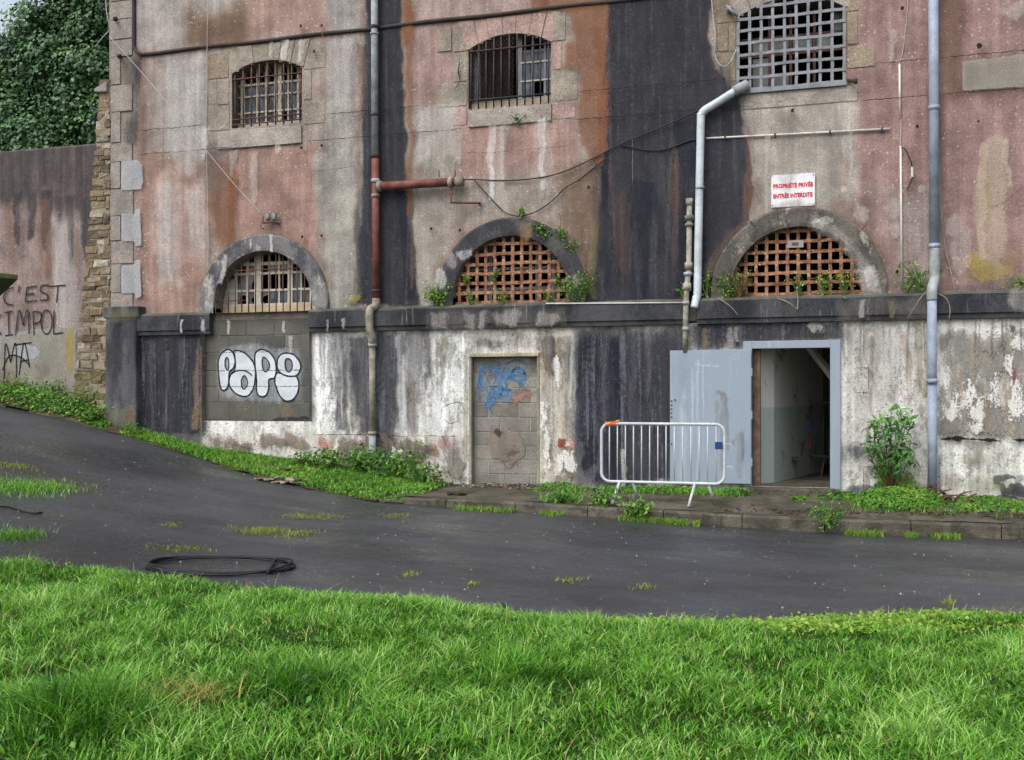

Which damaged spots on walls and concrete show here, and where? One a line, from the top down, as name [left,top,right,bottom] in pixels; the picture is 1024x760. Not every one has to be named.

rust [531,0,608,162]
damp [0,144,96,262]
damp [587,0,753,303]
peeling [540,401,577,485]
damp [575,322,844,490]
peeling [937,325,1024,442]
flaking render [993,474,1024,499]